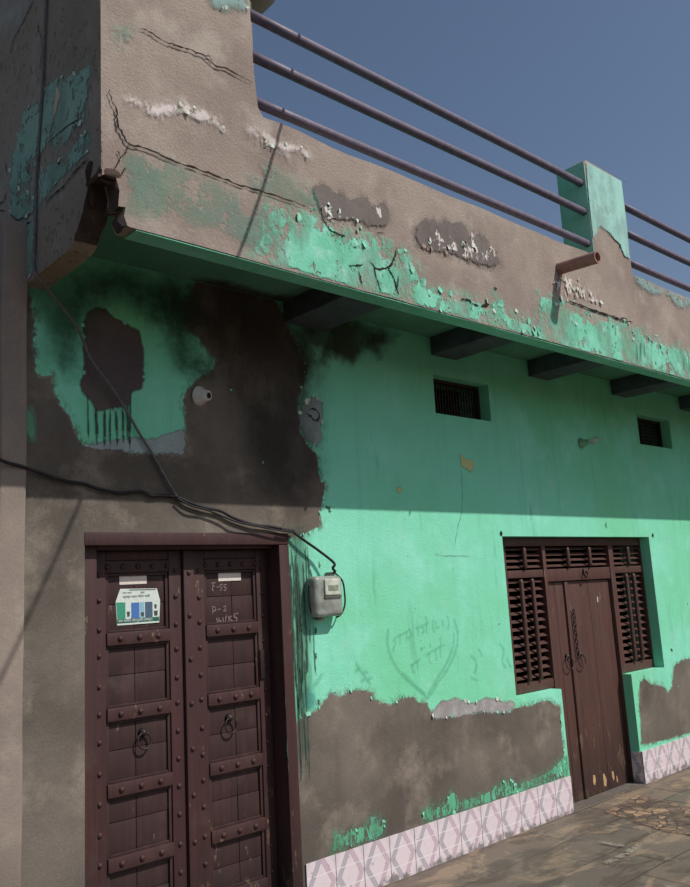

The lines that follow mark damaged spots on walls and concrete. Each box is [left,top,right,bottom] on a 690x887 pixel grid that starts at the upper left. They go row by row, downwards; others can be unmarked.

crack [141,28,253,83]
peeling [7,65,126,278]
crack [109,89,345,237]
crack [350,232,400,295]
peeling [255,184,690,379]
peeling [586,162,630,258]
peeling [21,282,327,887]
leakage [290,547,321,781]
peeling [296,688,567,887]
peeling [639,659,690,784]